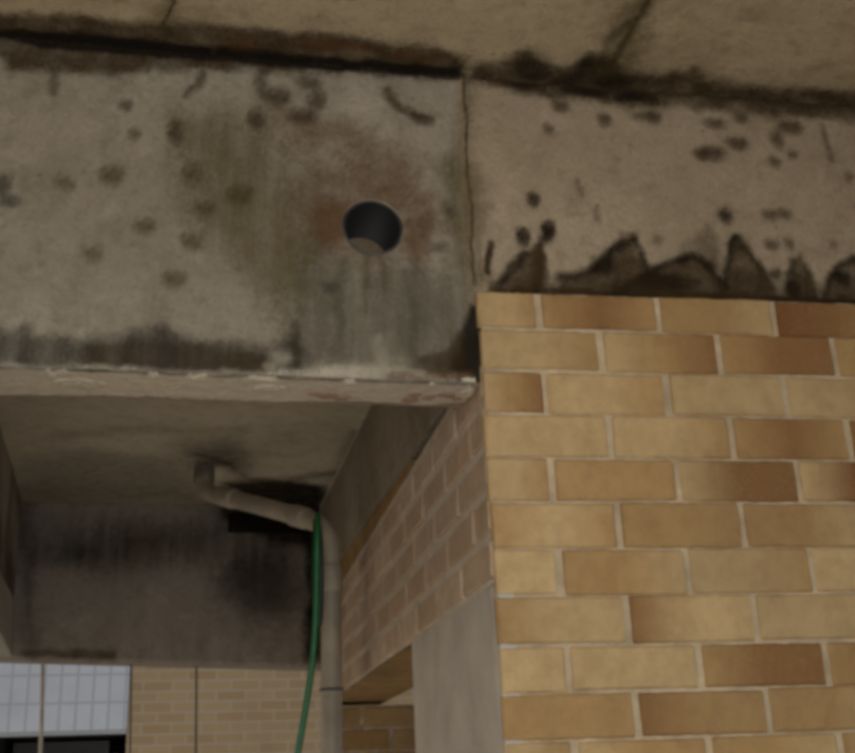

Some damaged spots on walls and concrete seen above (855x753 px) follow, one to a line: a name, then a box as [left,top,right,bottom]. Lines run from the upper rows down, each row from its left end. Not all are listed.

damp [0,15,855,142]
crack [604,0,651,74]
damp [494,220,855,304]
damp [120,267,354,375]